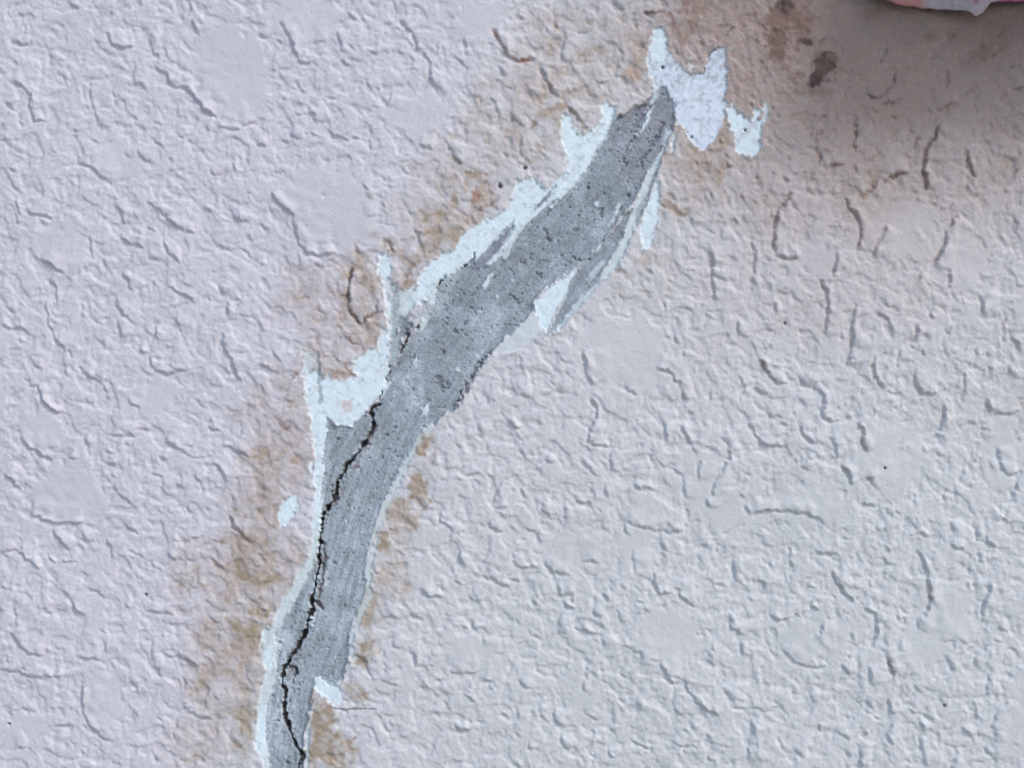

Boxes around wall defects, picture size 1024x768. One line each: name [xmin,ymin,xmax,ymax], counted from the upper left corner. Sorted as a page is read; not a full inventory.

damp [144,42,540,768]
crack [275,321,421,768]
crack [436,251,476,289]
spalling [251,22,771,768]
damp [501,0,1024,482]